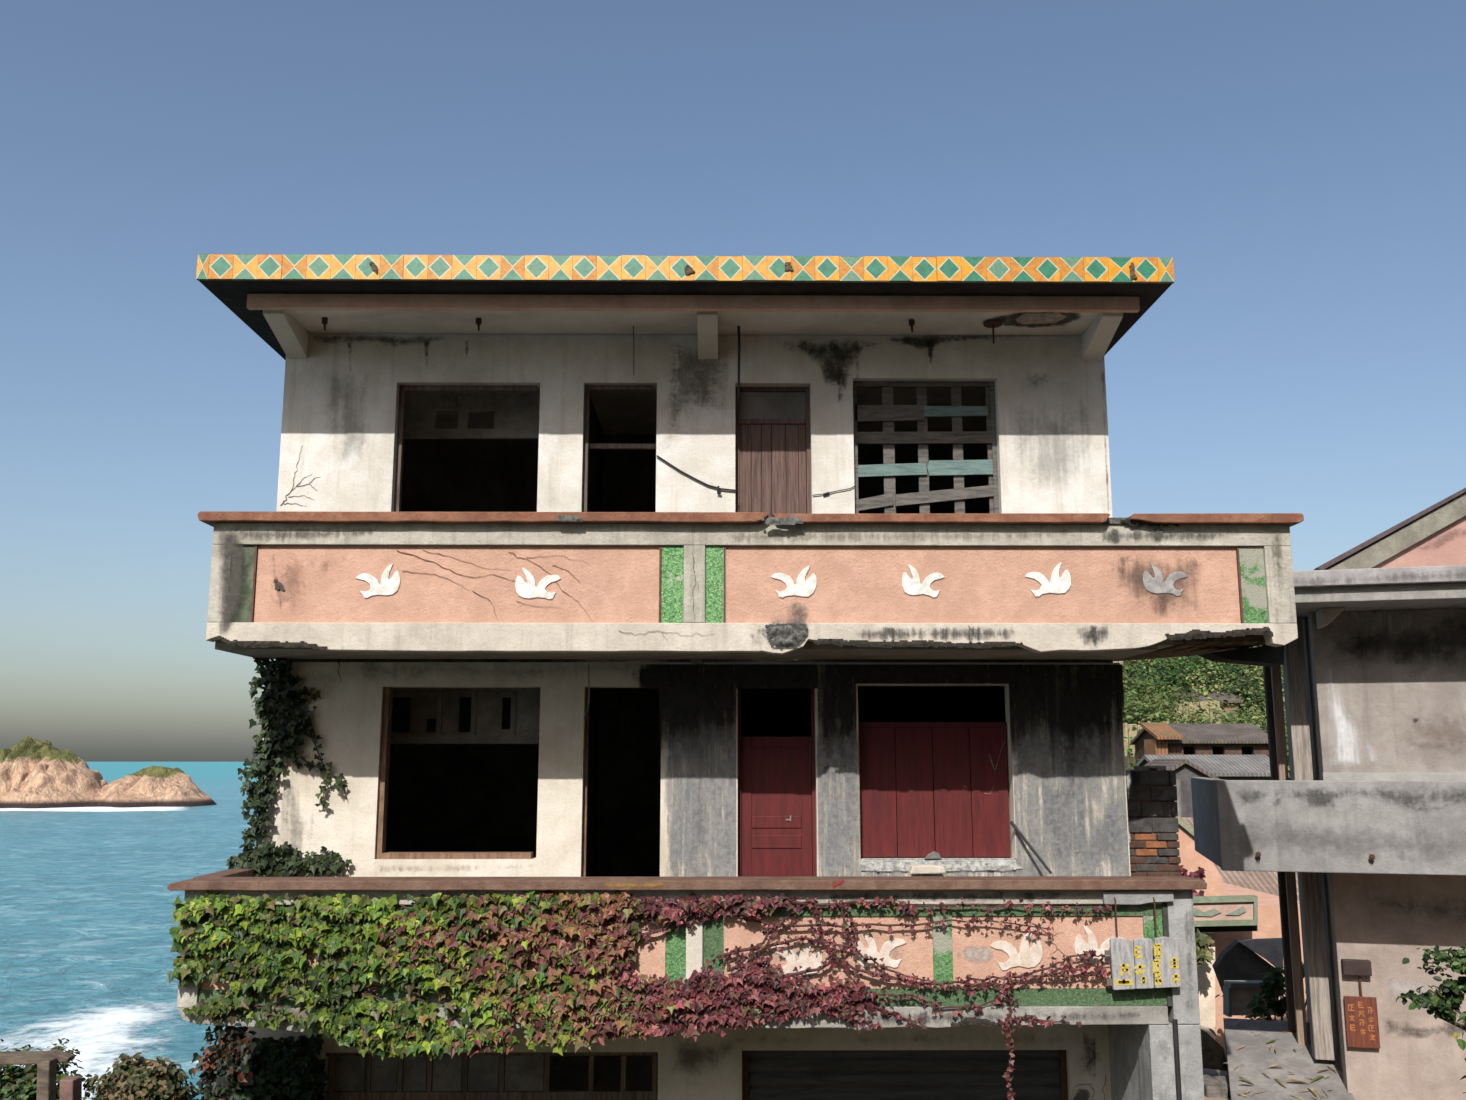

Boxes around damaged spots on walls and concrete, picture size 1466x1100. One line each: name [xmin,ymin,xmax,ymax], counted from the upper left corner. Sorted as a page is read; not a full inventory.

water stain [798,341,868,399]
crack [280,445,319,506]
crack [397,550,709,636]
spalling [765,623,1023,649]
spalling [1165,627,1273,640]